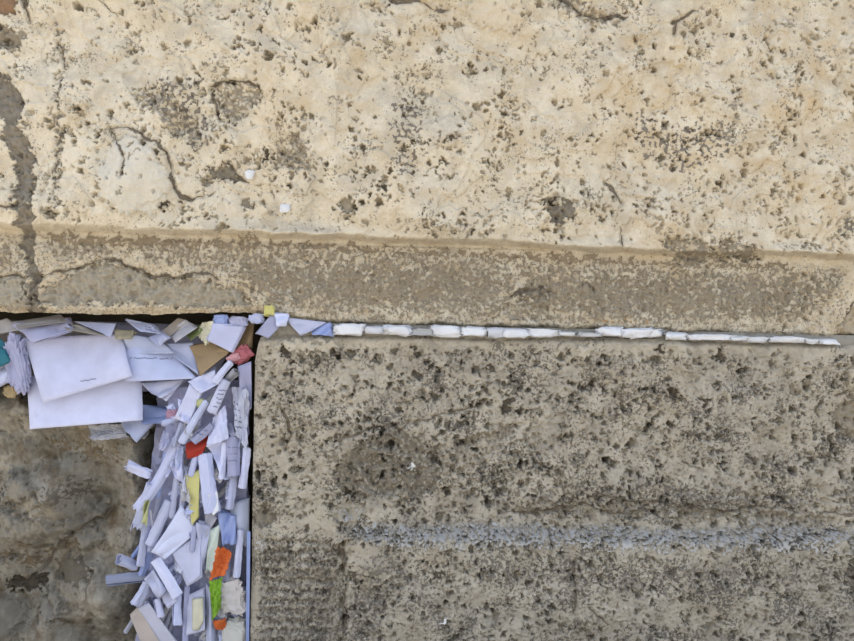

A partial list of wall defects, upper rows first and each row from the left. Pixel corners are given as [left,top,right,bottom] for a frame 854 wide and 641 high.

crack [20,0,31,22]
crack [389,0,447,13]
crack [560,0,627,21]
crack [210,80,261,119]
crack [0,22,220,313]